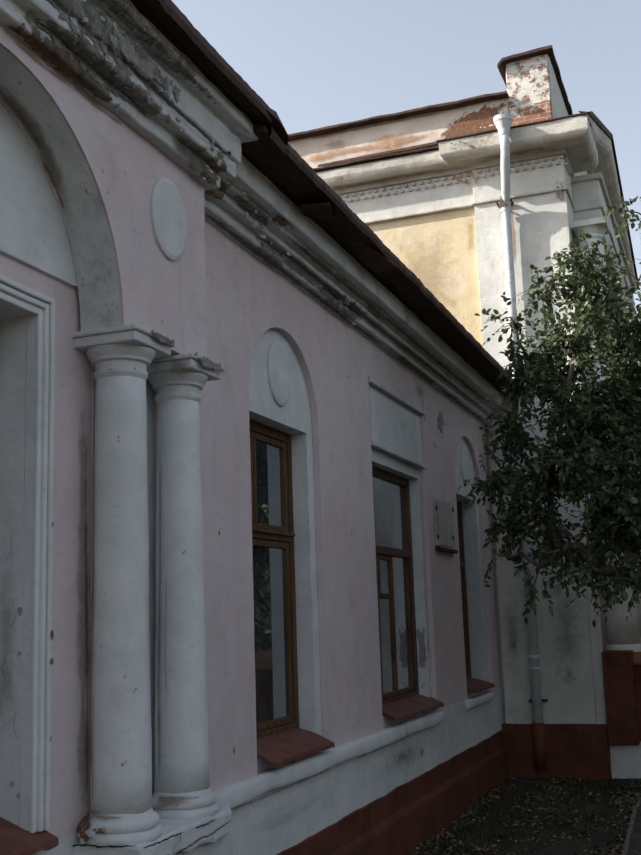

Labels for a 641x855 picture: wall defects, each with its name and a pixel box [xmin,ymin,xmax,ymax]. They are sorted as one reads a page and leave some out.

spalling [26,0,220,132]
flaking render [436,100,508,150]
spalling [200,138,294,239]
crack [73,819,216,849]